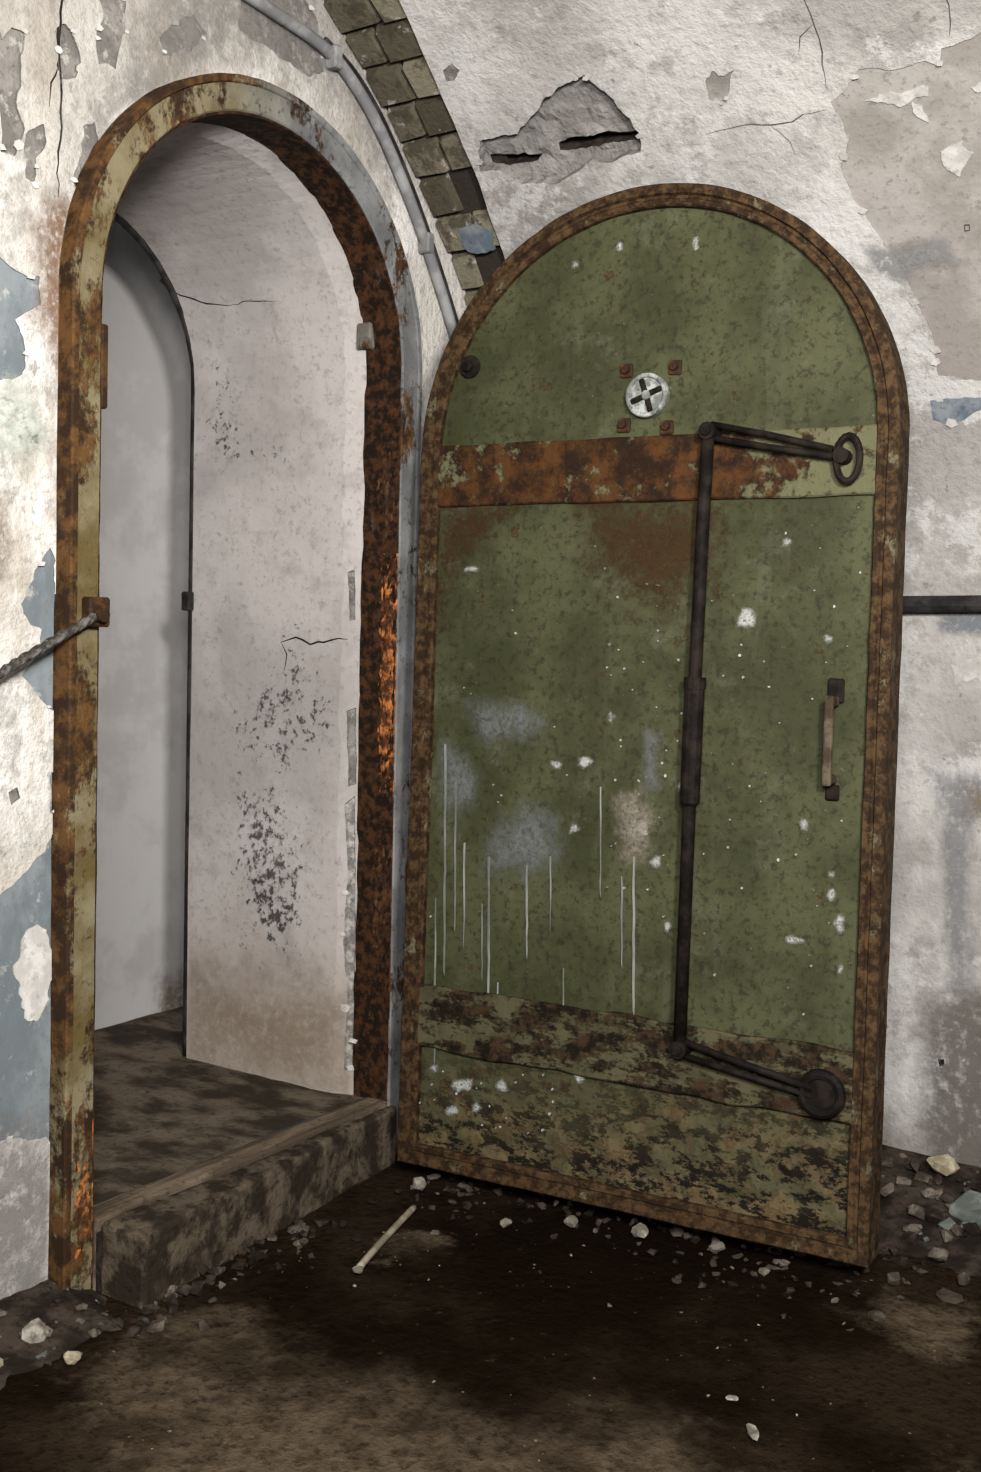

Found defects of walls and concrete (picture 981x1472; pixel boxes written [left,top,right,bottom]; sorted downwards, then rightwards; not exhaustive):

spalling [0,27,47,188]
crack [49,0,64,196]
spalling [474,75,645,184]
crack [709,0,827,154]
crack [944,0,952,36]
spalling [831,33,981,428]
peeling [0,257,41,380]
crack [280,636,348,673]
corrosion [375,430,401,797]
water stain [227,624,333,959]
peeling [0,839,52,1144]
corrosion [72,1119,93,1274]